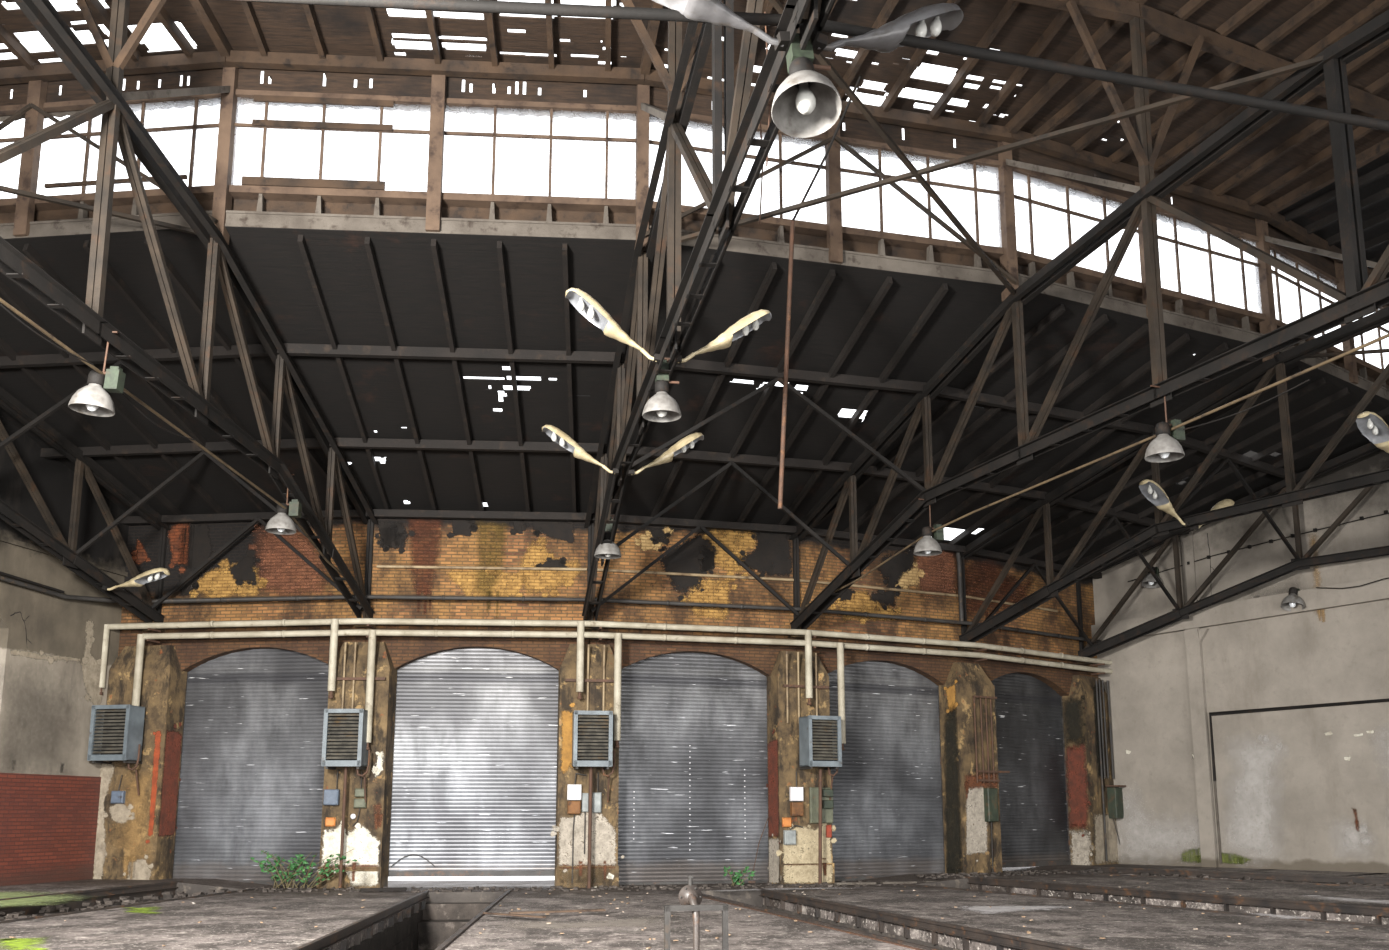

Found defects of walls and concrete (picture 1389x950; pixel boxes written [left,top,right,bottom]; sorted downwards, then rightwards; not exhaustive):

peeling [377,531,415,554]
peeling [447,519,580,597]
peeling [634,527,673,552]
peeling [678,529,765,620]
flaking render [830,551,958,624]
peeling [944,680,958,713]
peeling [93,722,182,880]
peeling [317,821,380,886]
peeling [551,809,625,887]
peeling [766,729,837,884]
peeling [965,787,988,862]